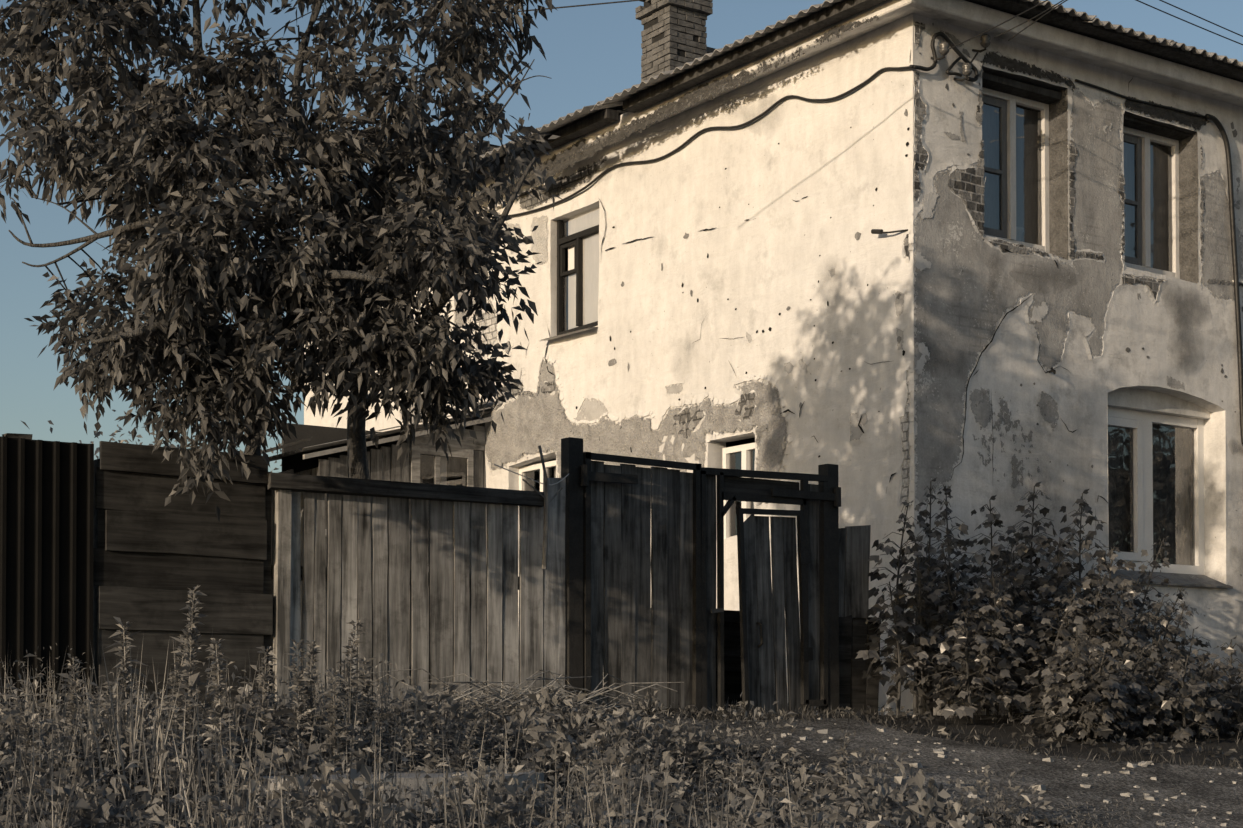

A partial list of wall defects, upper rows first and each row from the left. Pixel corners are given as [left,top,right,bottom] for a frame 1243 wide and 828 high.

flaking render [913,16,934,54]
spalling [450,15,879,265]
flaking render [444,273,514,361]
flaking render [743,306,790,348]
flaking render [891,46,1243,517]
flaking render [485,354,817,481]
flaking render [847,407,880,446]